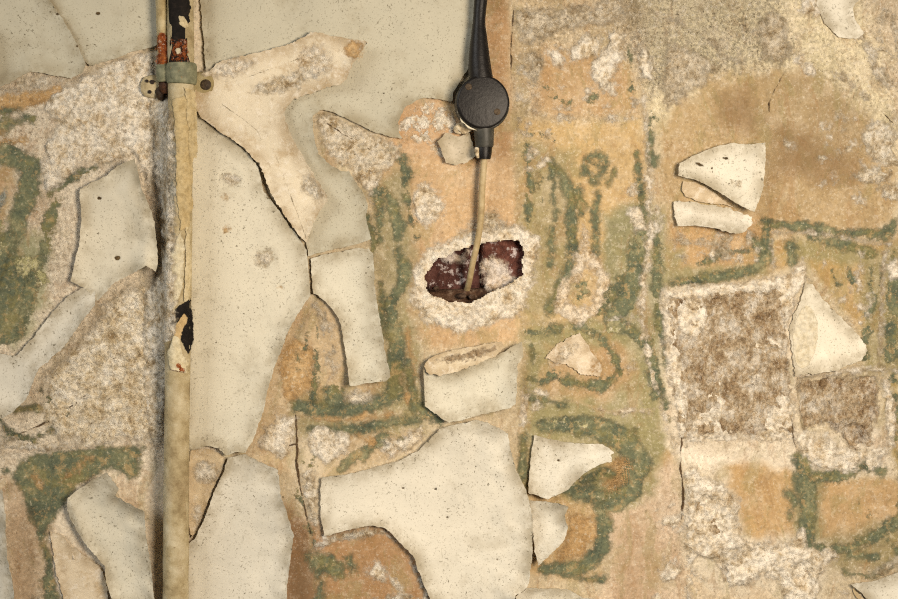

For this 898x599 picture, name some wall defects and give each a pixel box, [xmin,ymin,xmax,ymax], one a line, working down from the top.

rust [155,33,188,64]
peeling [71,158,158,301]
peeling [171,298,194,353]
flaking render [437,133,476,165]
spalling [425,240,524,303]
flaking render [546,333,602,377]
water stain [258,32,898,599]
peeling [673,143,766,234]
spalling [668,239,889,450]
peeling [50,472,154,599]
peeling [528,435,614,566]
peeling [851,572,898,599]